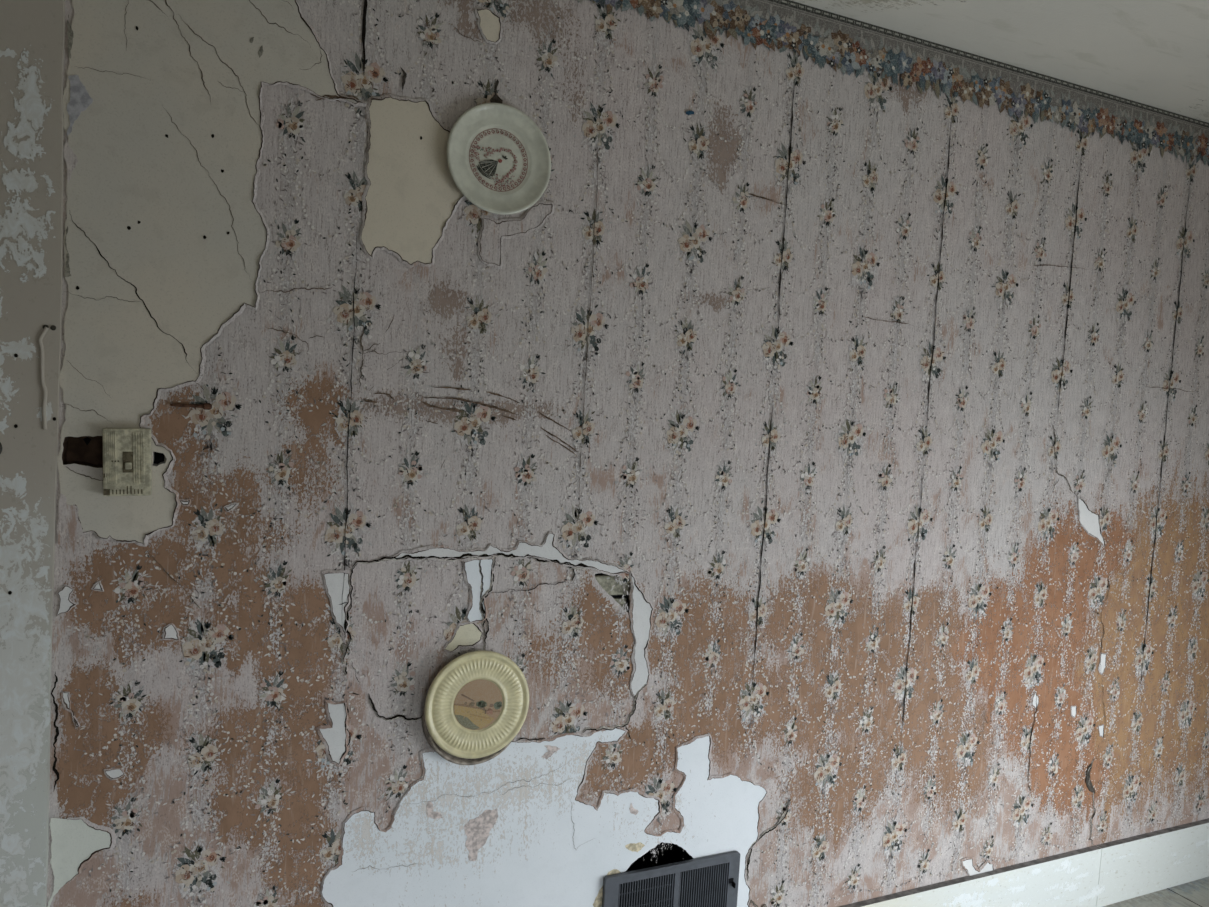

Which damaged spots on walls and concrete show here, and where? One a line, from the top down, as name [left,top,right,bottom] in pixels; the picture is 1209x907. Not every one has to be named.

crack [76,0,256,122]
crack [249,0,362,103]
peeling [0,44,56,283]
crack [163,107,332,293]
peeling [0,337,39,435]
spalling [62,436,103,481]
crack [70,214,204,391]
spalling [152,451,167,466]
peeling [0,471,51,907]
damp [55,276,573,907]
damp [505,553,1007,875]
damp [1032,457,1209,843]